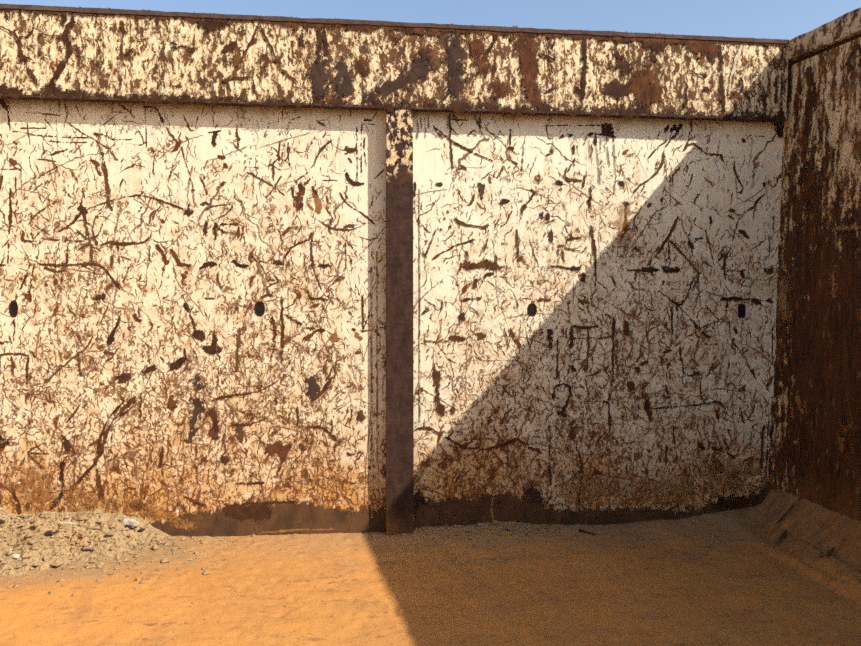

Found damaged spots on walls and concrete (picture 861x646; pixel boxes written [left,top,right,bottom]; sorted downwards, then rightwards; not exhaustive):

rust [0,3,788,138]
peeling [729,45,742,94]
rust [91,149,123,211]
rust [290,178,322,213]
rust [414,66,861,528]
rust [0,319,37,384]
rust [116,372,131,383]
rust [303,375,334,404]
rust [167,374,220,460]
rust [234,426,245,442]
rust [260,440,306,471]
rust [149,497,386,537]